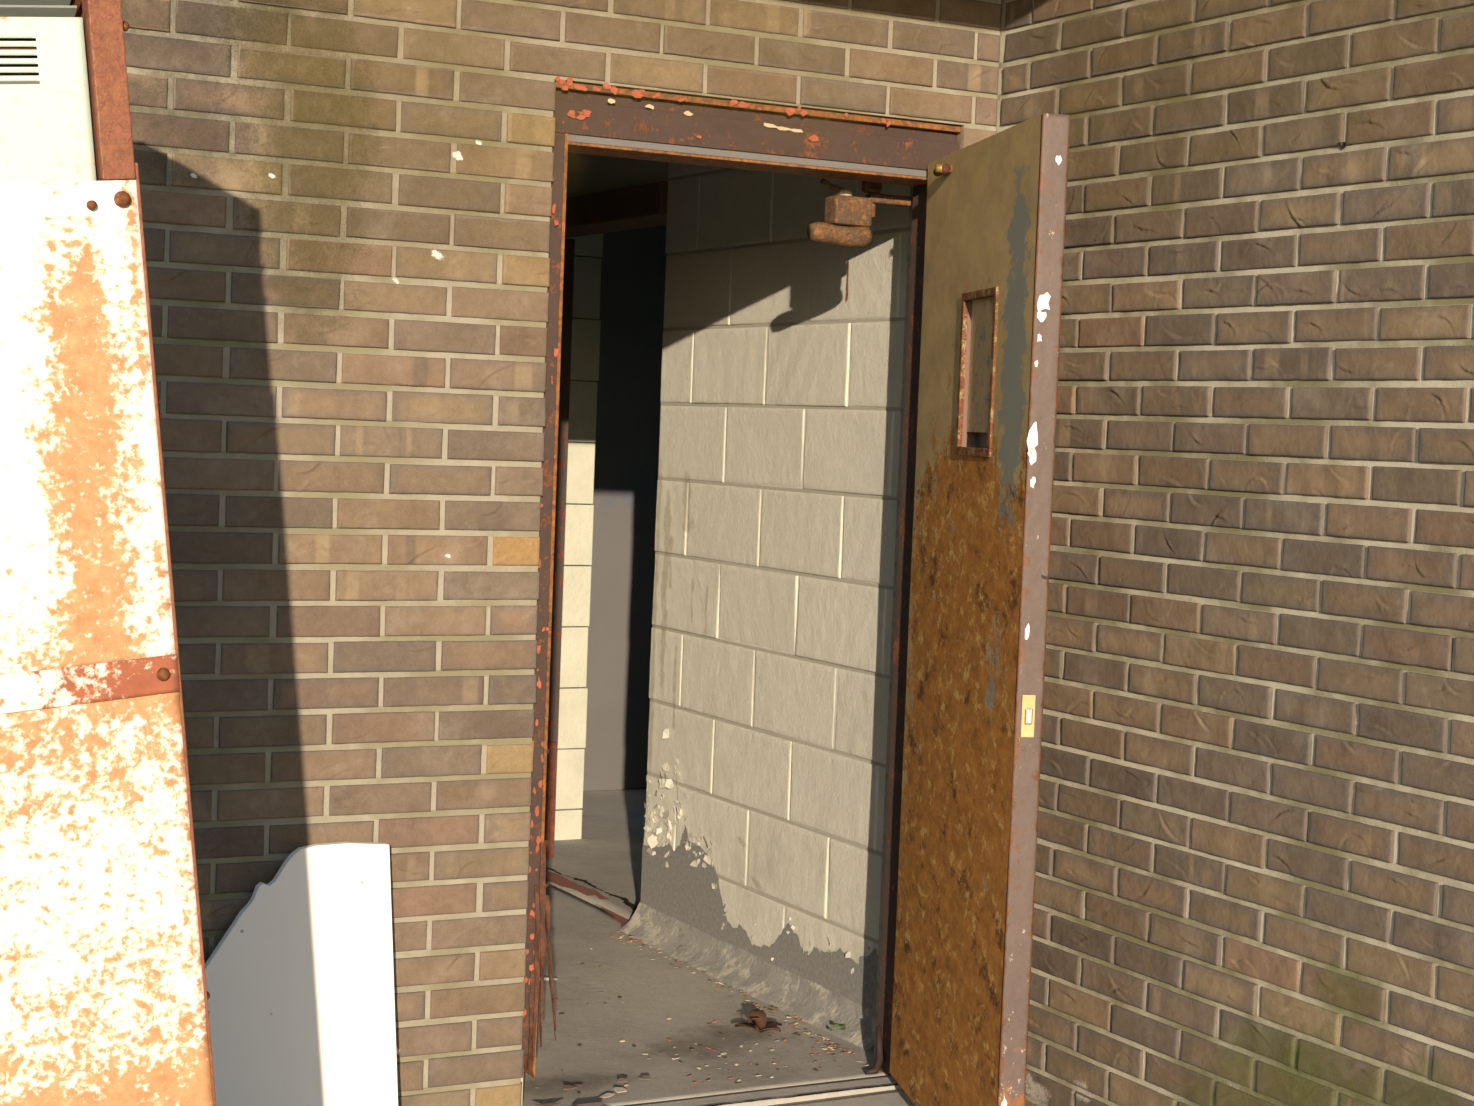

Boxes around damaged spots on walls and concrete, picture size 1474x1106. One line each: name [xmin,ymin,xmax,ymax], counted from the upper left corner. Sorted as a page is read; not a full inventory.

corrosion [527,843,556,1069]
peeling [640,758,878,1011]